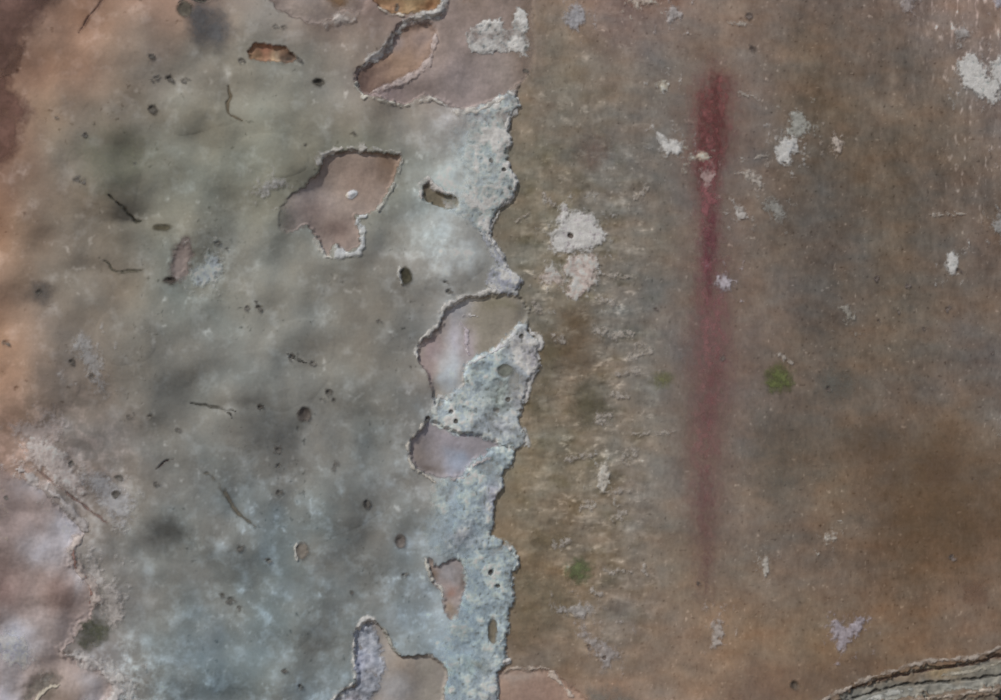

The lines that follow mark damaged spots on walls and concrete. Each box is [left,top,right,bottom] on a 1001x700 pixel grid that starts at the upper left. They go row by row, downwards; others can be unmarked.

peeling [270,0,356,29]
spalling [238,43,302,63]
peeling [957,53,1001,104]
spalling [286,144,403,258]
peeling [540,203,607,300]
spalling [331,0,586,700]
peeling [597,462,609,492]
peeling [831,617,865,651]
spalling [822,646,1001,700]